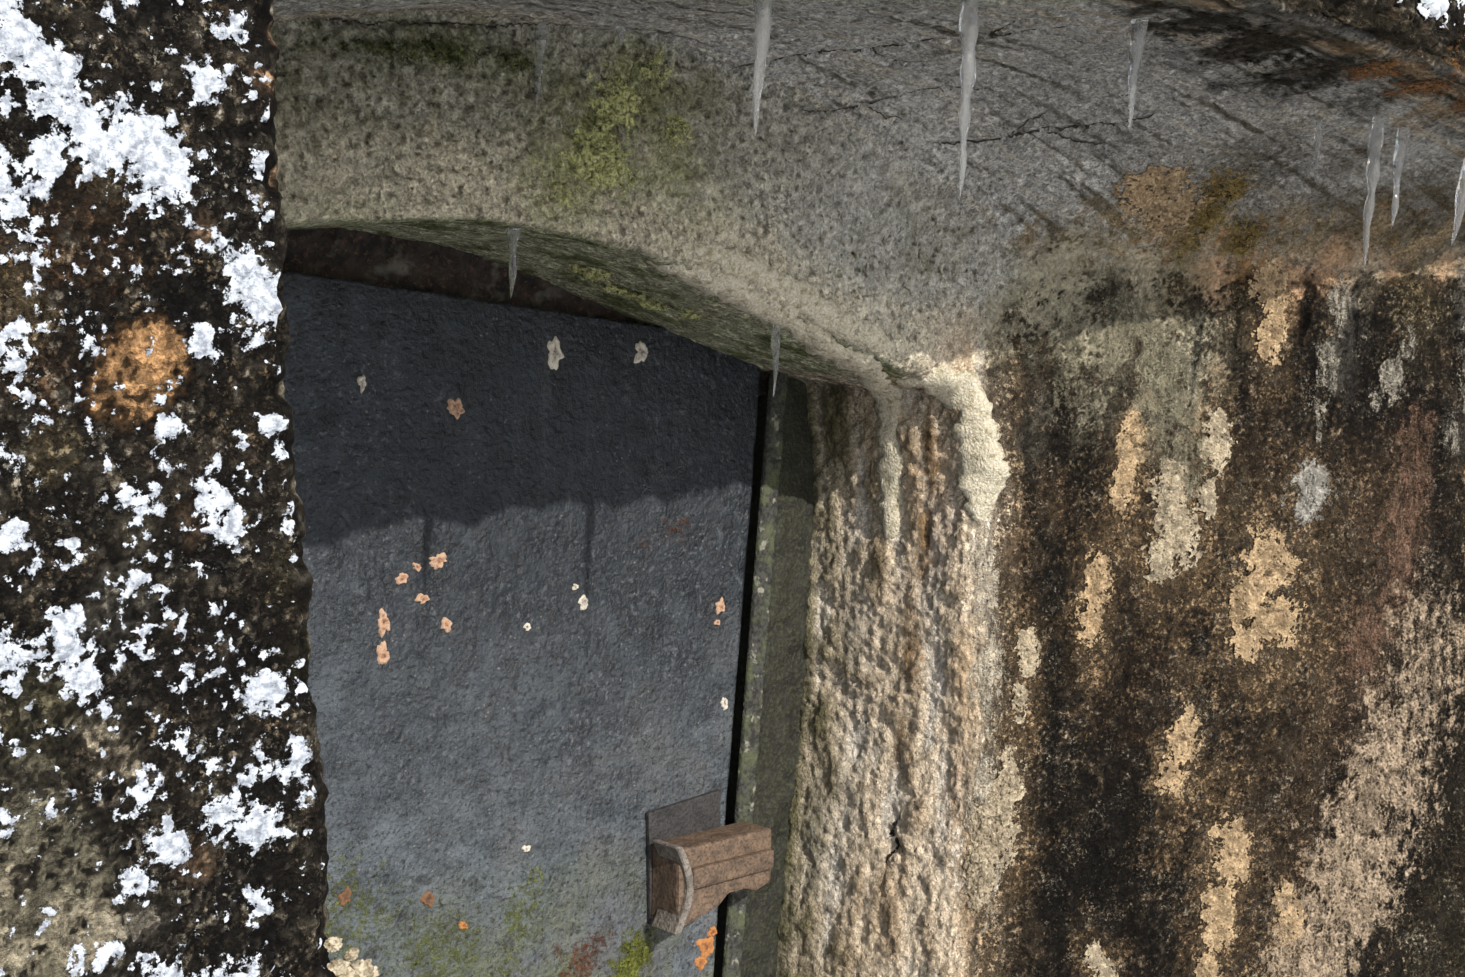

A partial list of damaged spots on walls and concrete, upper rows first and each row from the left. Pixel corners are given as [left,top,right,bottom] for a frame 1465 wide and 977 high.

leakage [1051,258,1210,534]
leakage [1313,264,1354,447]
leakage [963,495,1006,933]
leakage [1251,325,1465,977]